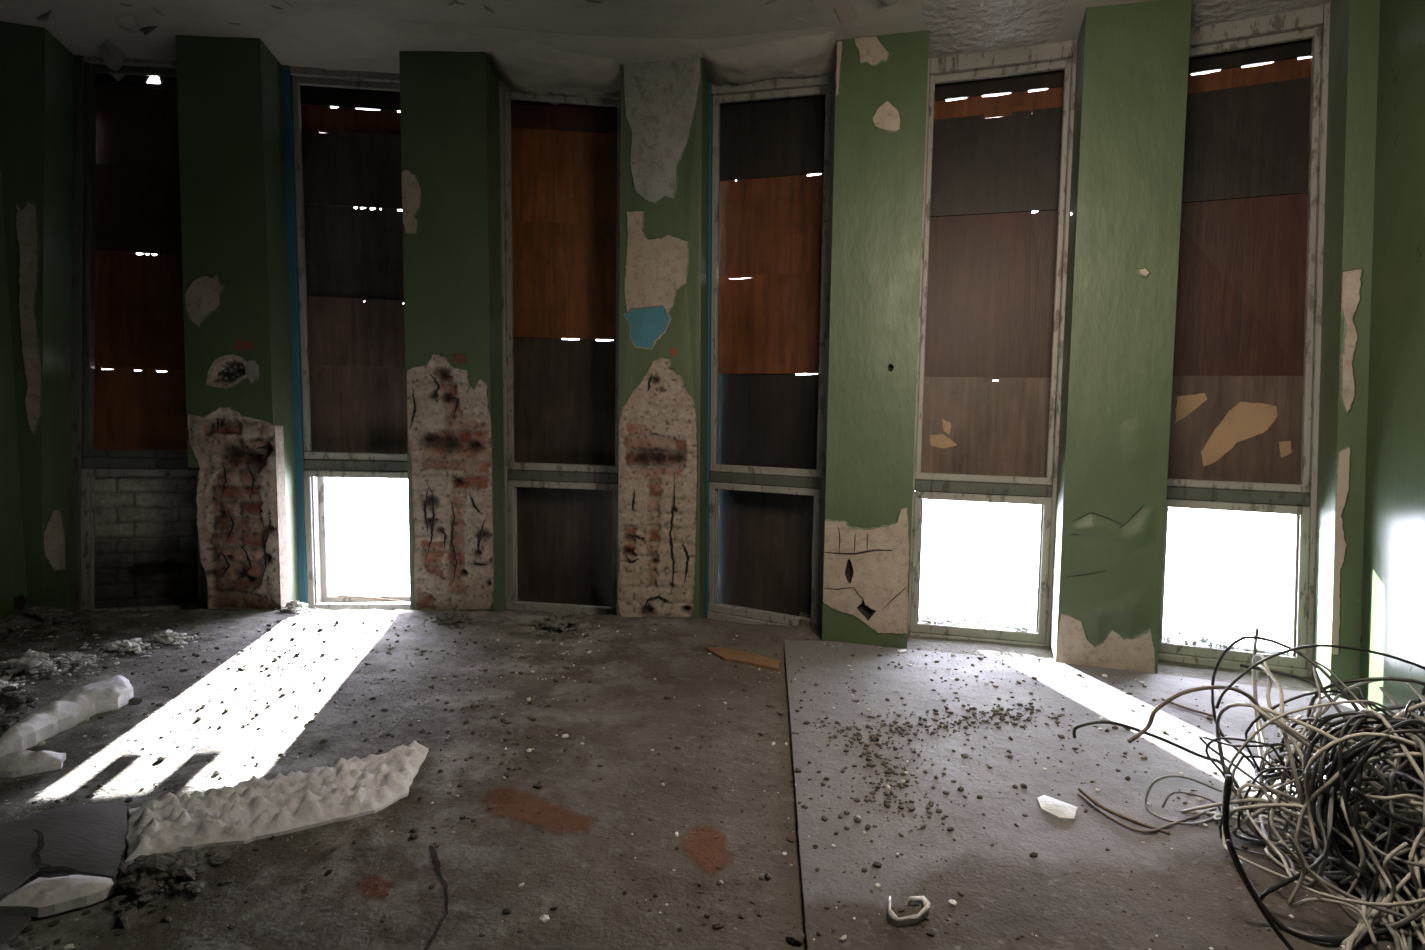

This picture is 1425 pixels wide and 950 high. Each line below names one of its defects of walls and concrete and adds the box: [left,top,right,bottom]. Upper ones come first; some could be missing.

peeling [836,36,891,96]
peeling [401,168,423,235]
peeling [622,58,702,316]
peeling [14,201,43,436]
peeling [184,273,225,328]
flaking render [206,354,259,389]
flaking render [188,407,289,610]
flaking render [406,352,495,611]
flaking render [618,357,698,617]
crack [824,528,907,609]
flaking render [823,507,913,666]
peeling [1056,613,1156,674]